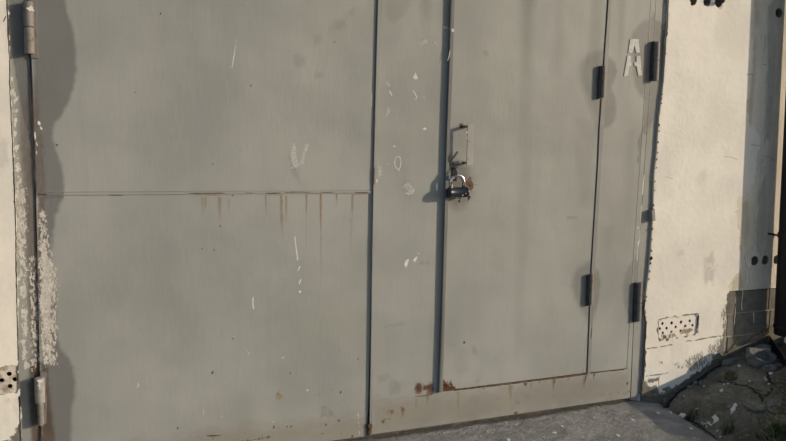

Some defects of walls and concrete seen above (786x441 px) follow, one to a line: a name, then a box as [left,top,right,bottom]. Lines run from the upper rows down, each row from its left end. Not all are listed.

peeling [10,76,60,371]
rust [415,383,433,397]
rust [443,369,624,391]
crack [661,364,783,440]